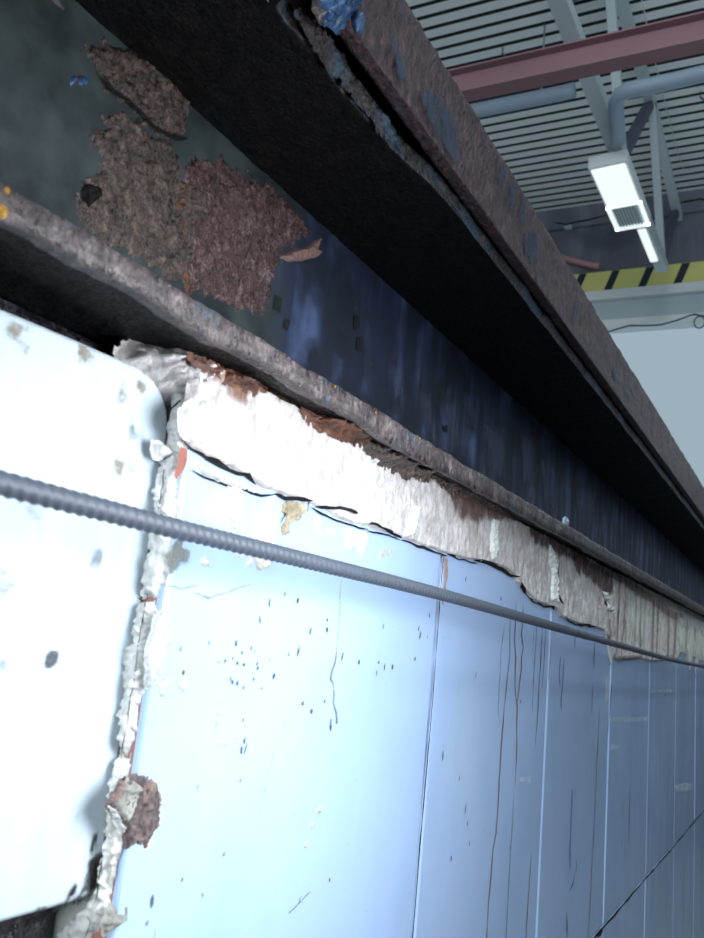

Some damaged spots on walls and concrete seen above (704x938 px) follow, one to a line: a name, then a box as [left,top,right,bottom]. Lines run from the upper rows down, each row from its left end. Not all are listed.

rust [75,36,312,317]
peeling [143,610,188,697]
peeling [238,553,271,571]
peeling [255,495,369,556]
rust [526,525,677,661]
leakage [487,621,564,931]